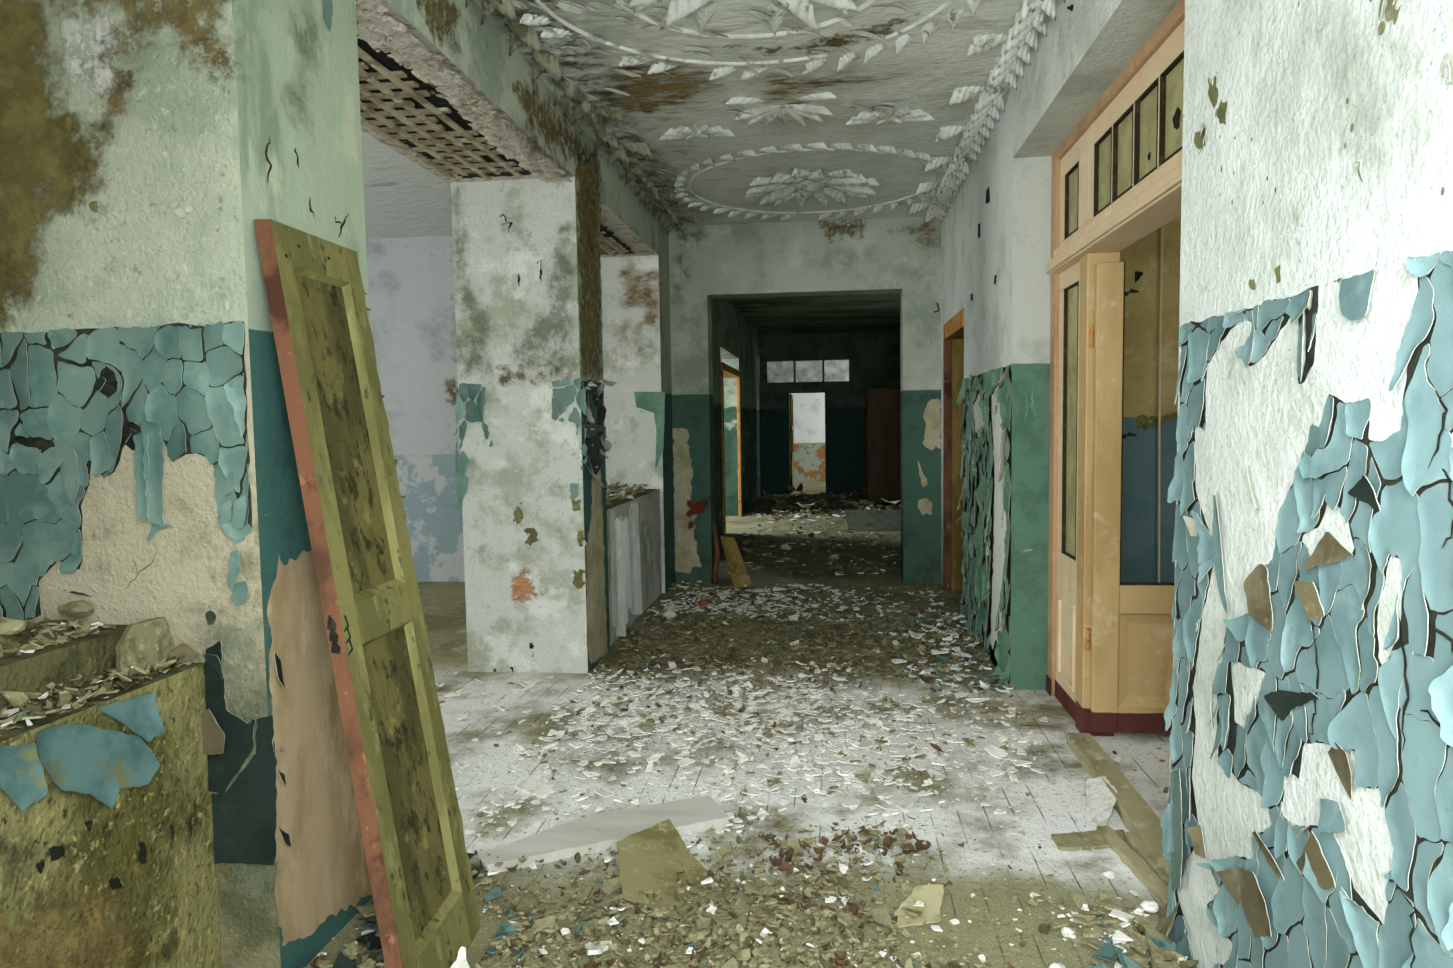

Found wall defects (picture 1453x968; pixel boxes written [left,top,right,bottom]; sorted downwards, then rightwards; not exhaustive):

water stain [0,0,229,323]
flaking render [356,0,572,183]
flaking render [1173,76,1252,154]
flaking render [1369,0,1401,36]
peeling [0,693,165,811]
peeling [0,321,252,621]
peeling [169,550,373,946]
peeling [454,382,493,508]
flaking render [549,378,642,663]
peeling [634,392,702,573]
peeling [918,364,1012,687]
peeling [1136,250,1453,968]